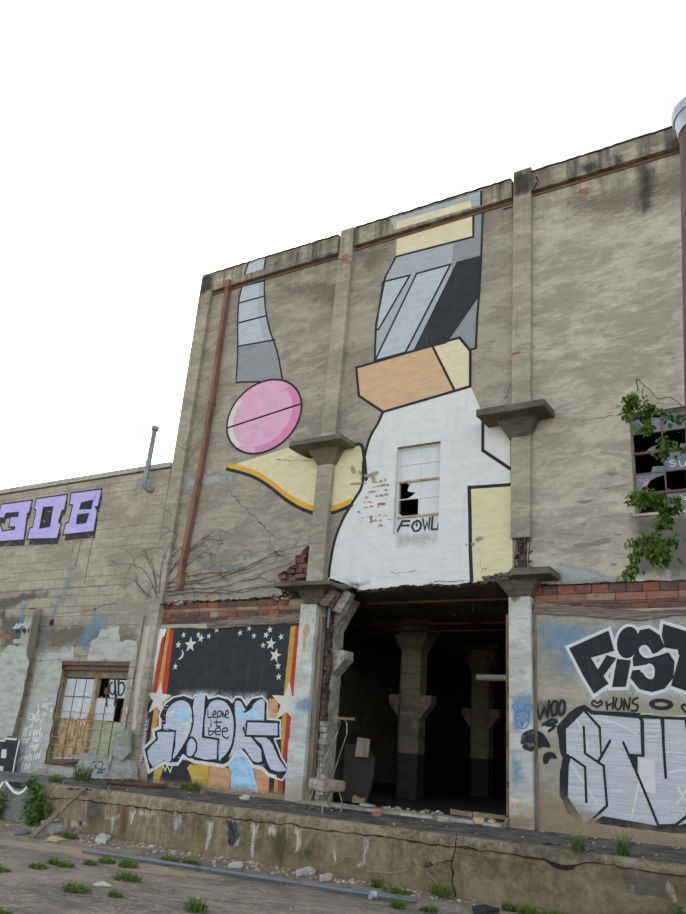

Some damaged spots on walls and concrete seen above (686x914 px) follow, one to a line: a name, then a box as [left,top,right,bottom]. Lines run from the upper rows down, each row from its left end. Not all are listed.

damp [577,166,680,213]
peeling [350,466,389,526]
spalling [271,550,309,603]
crack [45,788,686,897]